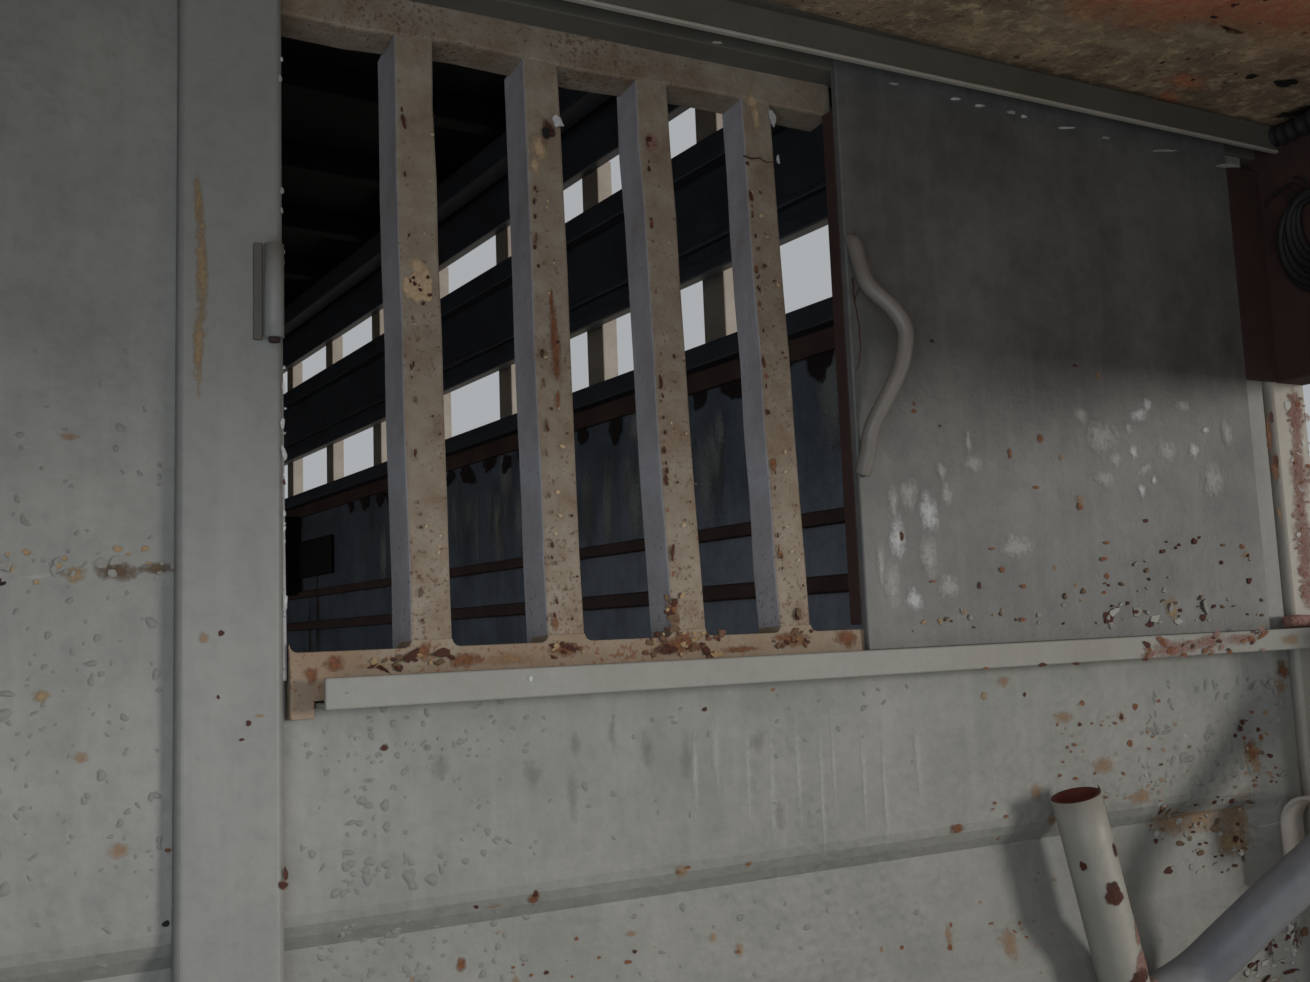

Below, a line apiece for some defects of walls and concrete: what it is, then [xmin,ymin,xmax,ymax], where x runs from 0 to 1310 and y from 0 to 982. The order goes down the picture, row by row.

peeling [1096,536,1269,659]
rust [306,656,341,682]
rust [361,643,479,673]
rust [549,618,586,659]
rust [642,592,756,658]
rust [772,608,813,649]